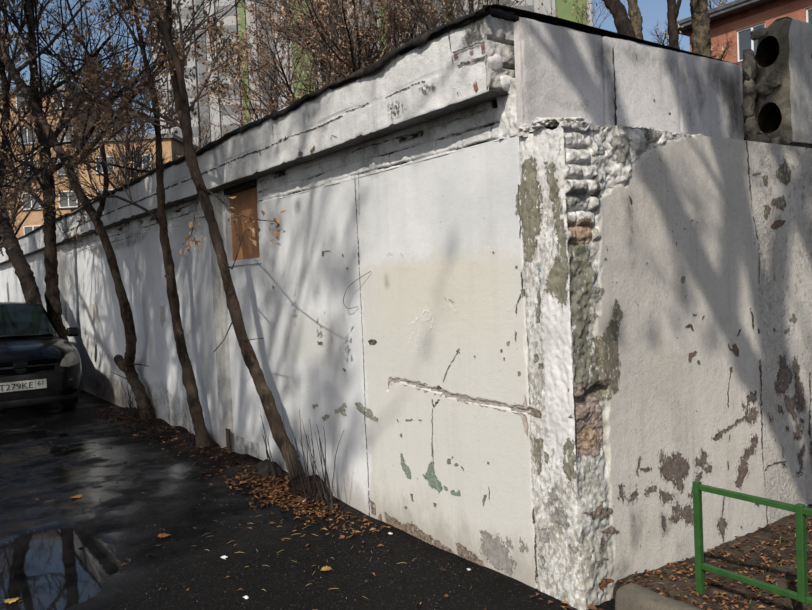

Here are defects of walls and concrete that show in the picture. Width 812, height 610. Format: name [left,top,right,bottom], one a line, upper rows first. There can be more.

spalling [741,27,790,145]
peeling [764,194,787,230]
peeling [322,402,378,422]
peeling [422,461,461,496]
peeling [370,500,528,577]
peeling [520,397,549,474]
spalling [562,378,609,483]
flaking render [583,502,619,553]
peeling [617,447,712,535]
peeling [717,496,728,543]
peeling [735,435,759,490]
peeling [711,355,807,441]